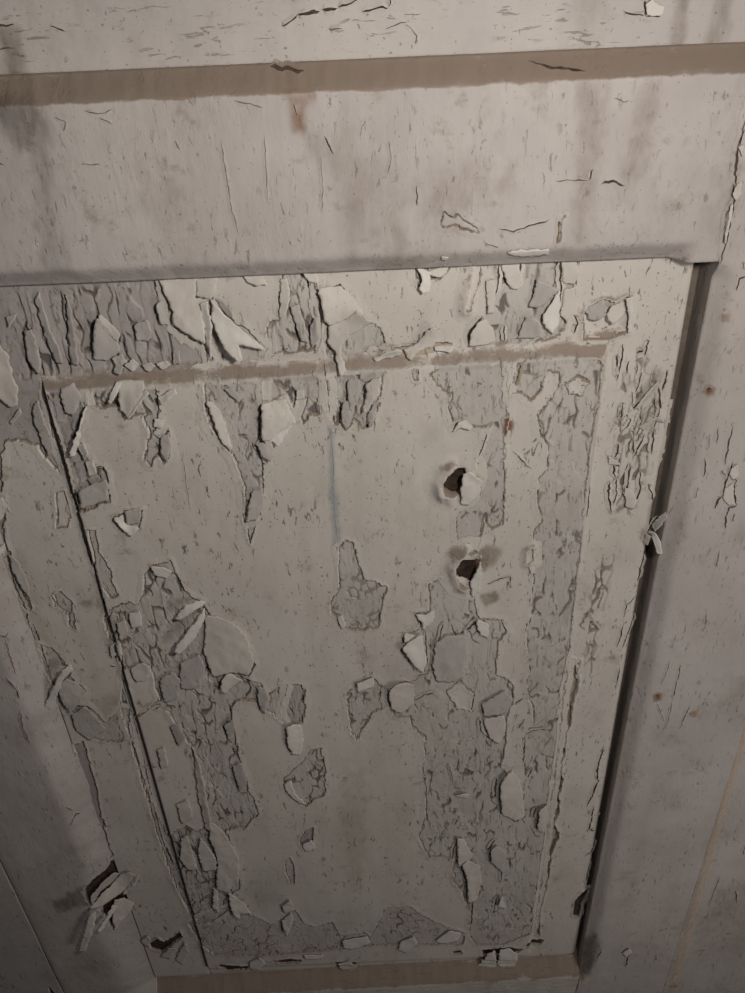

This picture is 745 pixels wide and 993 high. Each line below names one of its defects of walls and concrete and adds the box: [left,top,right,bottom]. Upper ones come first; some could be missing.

peeling [623,0,665,21]
peeling [433,205,486,239]
crack [717,100,745,291]
peeling [0,211,610,973]